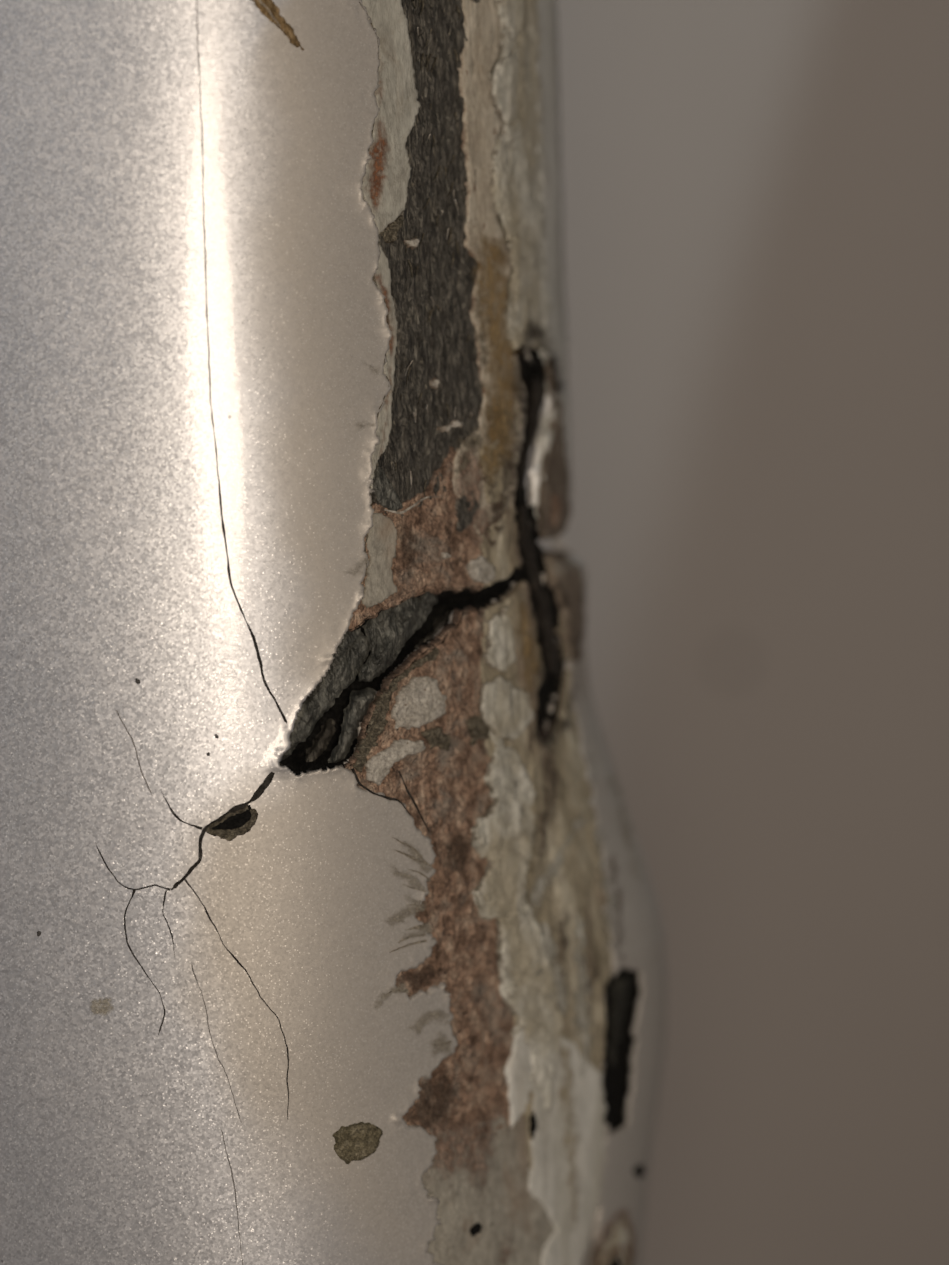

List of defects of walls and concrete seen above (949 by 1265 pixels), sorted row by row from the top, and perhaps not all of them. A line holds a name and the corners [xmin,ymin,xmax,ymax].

crack [95,0,576,1265]
peeling [359,0,420,608]
peeling [352,647,451,786]
peeling [415,0,640,1265]